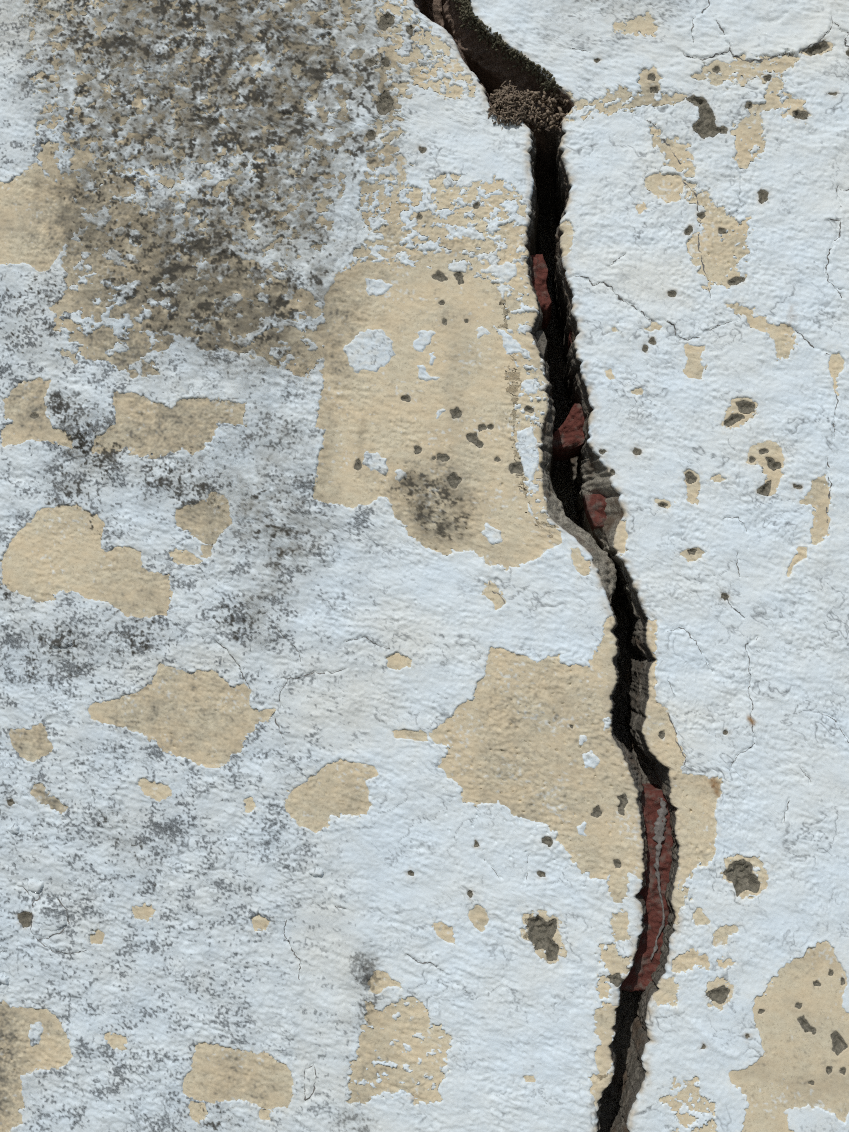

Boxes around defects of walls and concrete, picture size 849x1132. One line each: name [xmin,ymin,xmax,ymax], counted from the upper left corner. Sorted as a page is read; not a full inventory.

water stain [38,0,389,373]
peeling [563,39,833,291]
water stain [6,269,60,345]
peeling [0,0,591,576]
peeling [0,491,232,618]
water stain [251,520,307,568]
crack [413,0,729,1132]
peeling [88,663,276,768]
peeling [392,616,645,1107]
peeling [0,1001,73,1132]
peeling [346,970,452,1105]
peeling [728,941,849,1132]